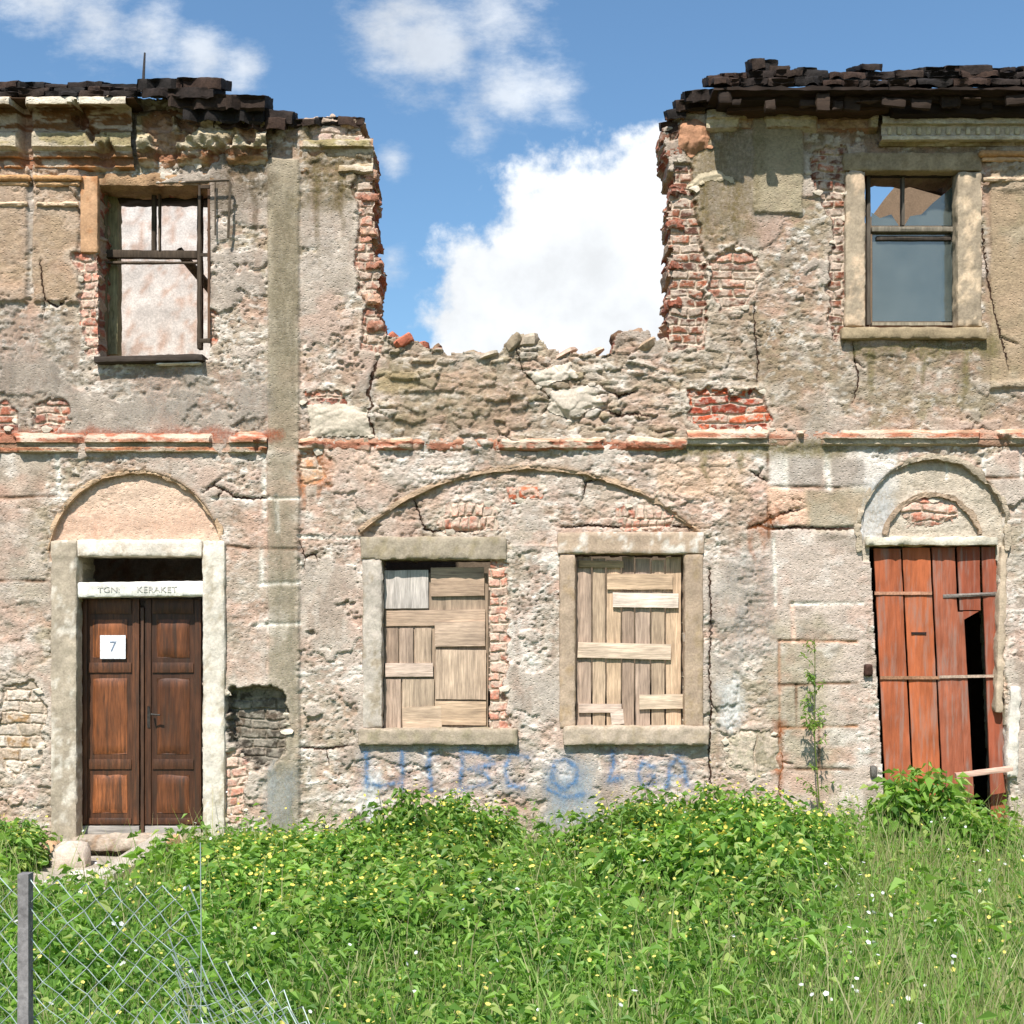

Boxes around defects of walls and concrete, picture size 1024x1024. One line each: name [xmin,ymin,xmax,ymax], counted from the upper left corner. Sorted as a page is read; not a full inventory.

spalling [308,122,386,358]
spalling [665,158,764,352]
spalling [805,144,851,342]
crack [981,228,1016,369]
crack [366,361,383,435]
crack [516,350,567,419]
spalling [687,385,776,432]
crack [414,501,466,533]
spalling [437,484,543,536]
spalling [488,560,511,729]
spalling [0,678,48,779]
spalling [225,685,293,829]